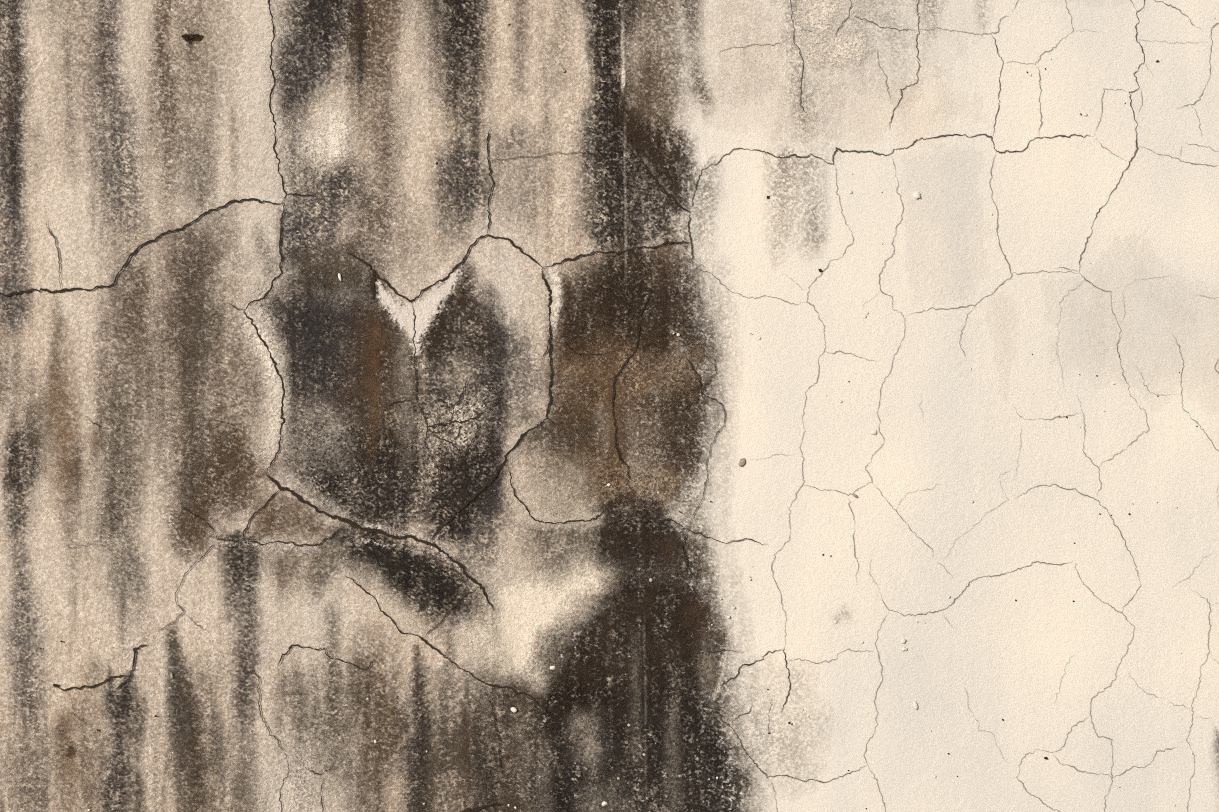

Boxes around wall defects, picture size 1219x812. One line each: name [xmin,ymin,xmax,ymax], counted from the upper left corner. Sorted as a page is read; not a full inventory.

damp [0,0,29,331]
damp [96,0,126,213]
crack [748,0,920,125]
crack [692,31,1087,206]
crack [904,0,1183,334]
damp [4,423,38,567]
damp [106,272,163,532]
crack [0,0,694,771]
damp [166,0,749,812]
damp [100,672,145,812]
crack [244,644,375,812]
crack [683,649,870,783]